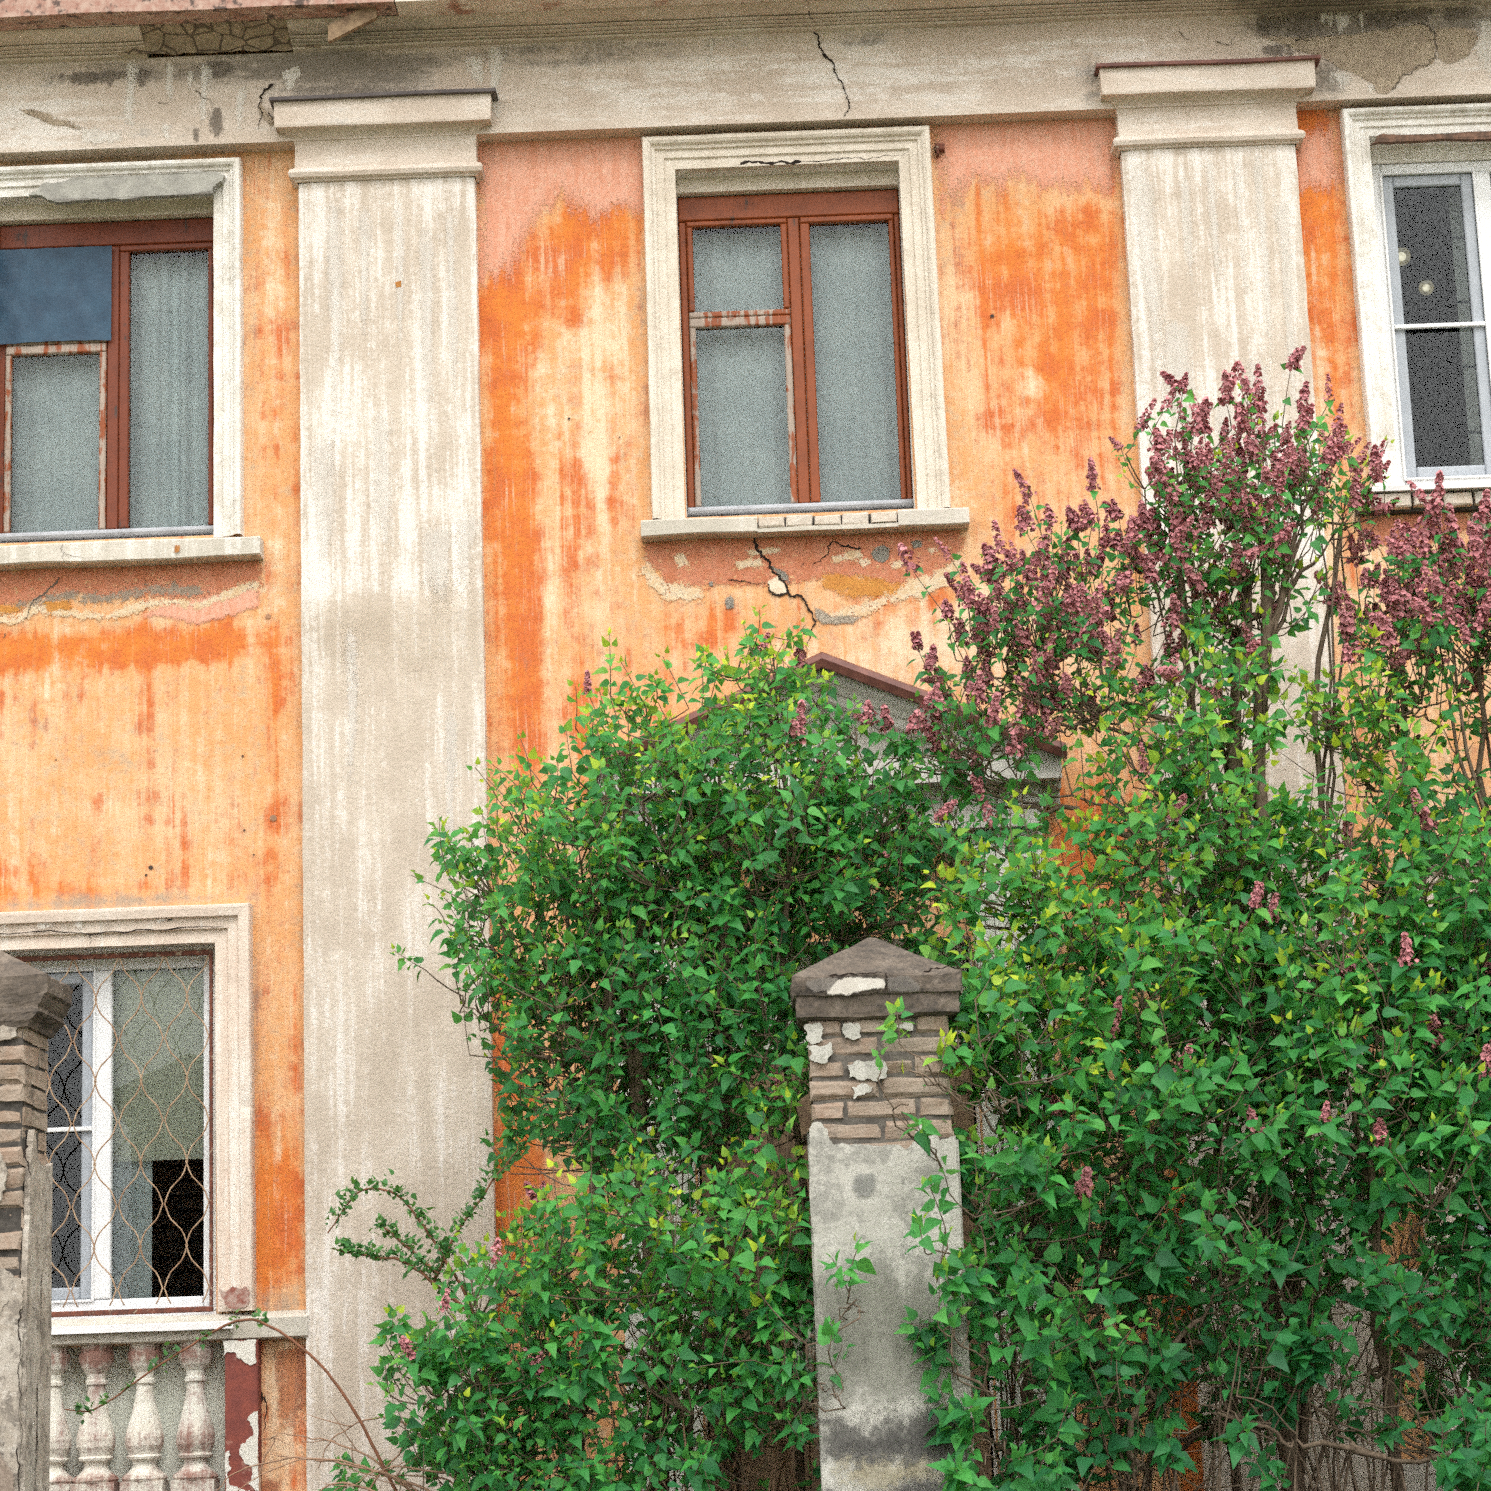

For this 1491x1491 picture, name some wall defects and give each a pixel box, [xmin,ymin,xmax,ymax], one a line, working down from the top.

peeling [282,66,301,90]
crack [806,0,851,116]
peeling [1262,23,1478,94]
damp [327,207,372,415]
damp [396,203,457,401]
spalling [1360,511,1491,546]
peeling [0,560,263,625]
crack [728,538,861,653]
peeling [637,530,968,617]
peeling [827,977,885,995]
peeling [223,1339,257,1365]
peeling [225,1411,259,1491]